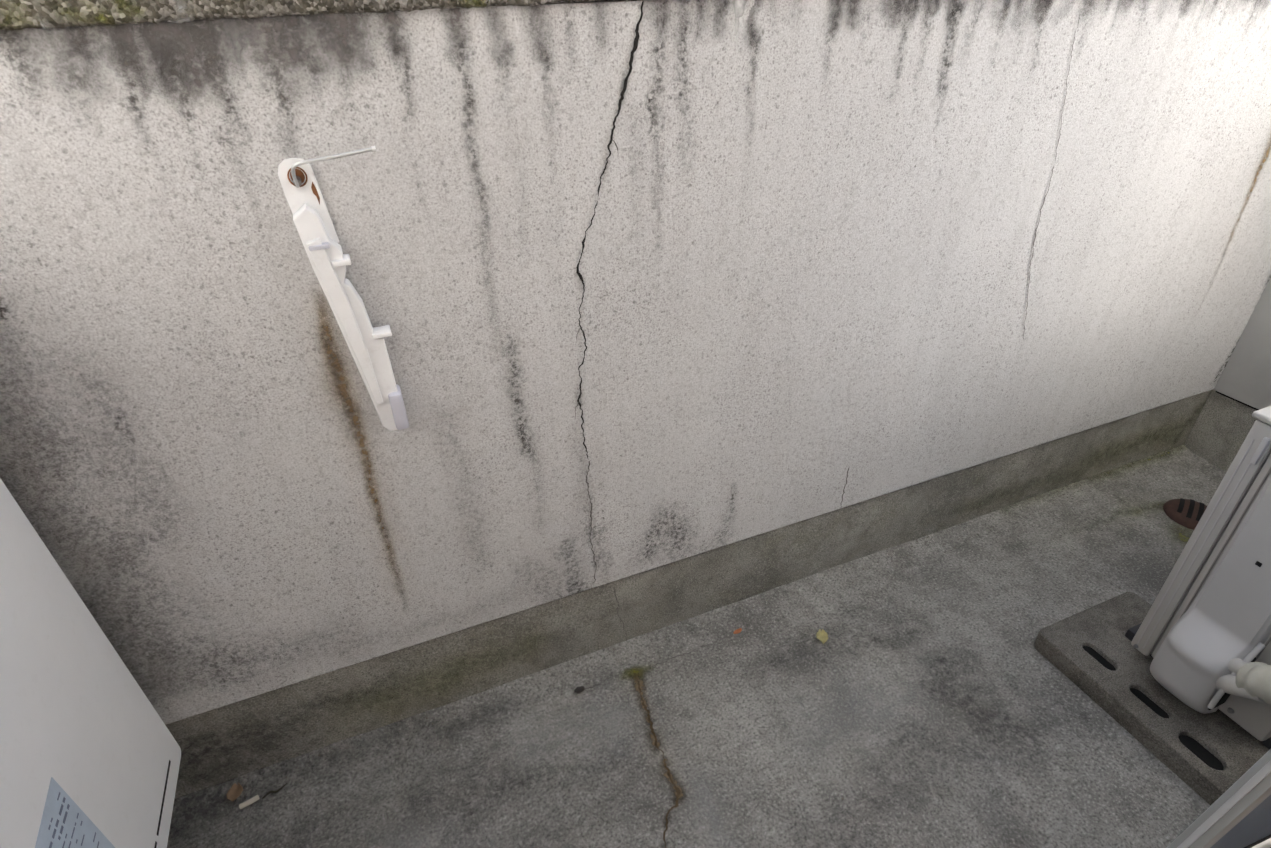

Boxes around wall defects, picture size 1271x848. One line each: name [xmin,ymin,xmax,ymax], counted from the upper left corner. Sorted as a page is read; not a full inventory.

water stain [64,12,363,121]
water stain [381,11,412,114]
water stain [448,8,487,226]
water stain [647,0,759,137]
water stain [831,0,859,30]
water stain [892,0,963,93]
water stain [1006,0,1051,33]
rust [322,315,393,564]
water stain [508,346,530,452]
crack [575,1,721,848]